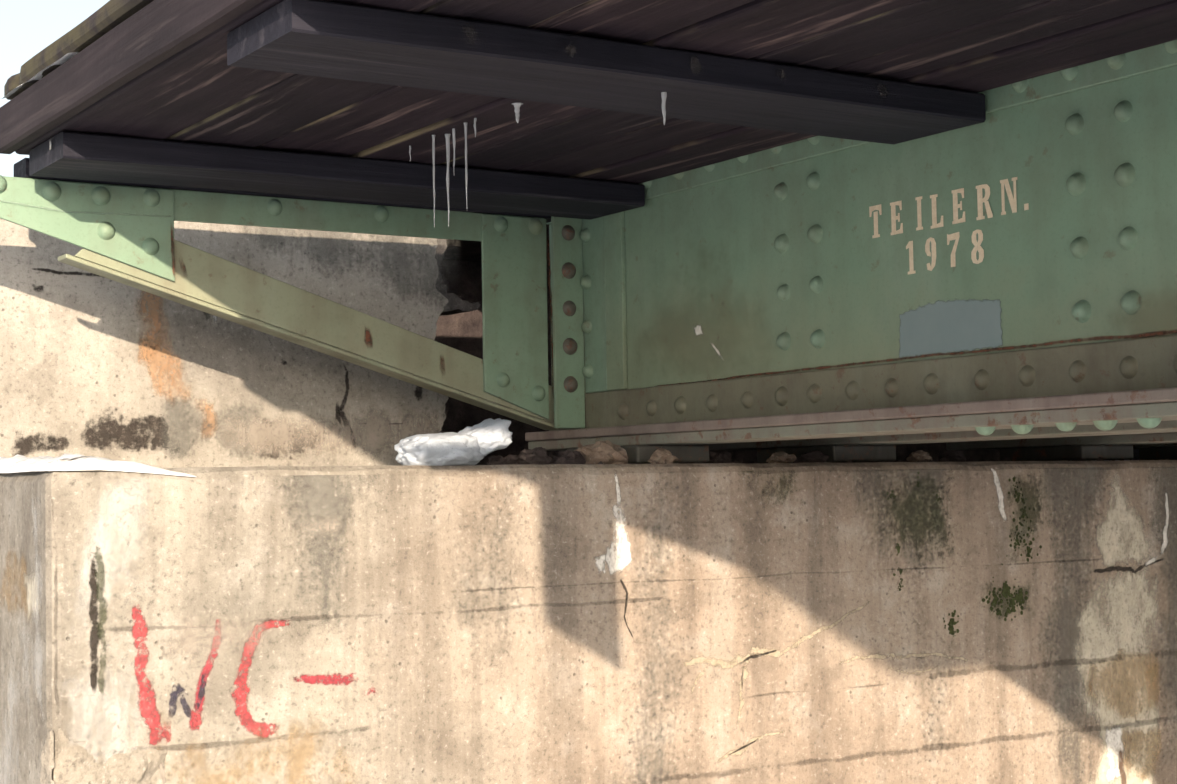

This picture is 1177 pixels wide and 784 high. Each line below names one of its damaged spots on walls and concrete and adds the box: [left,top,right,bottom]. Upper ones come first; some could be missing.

rust [138,292,189,404]
crack [336,366,403,447]
crack [1094,559,1163,573]
leakage [1146,493,1169,565]
crack [620,580,632,635]
crack [684,602,868,762]